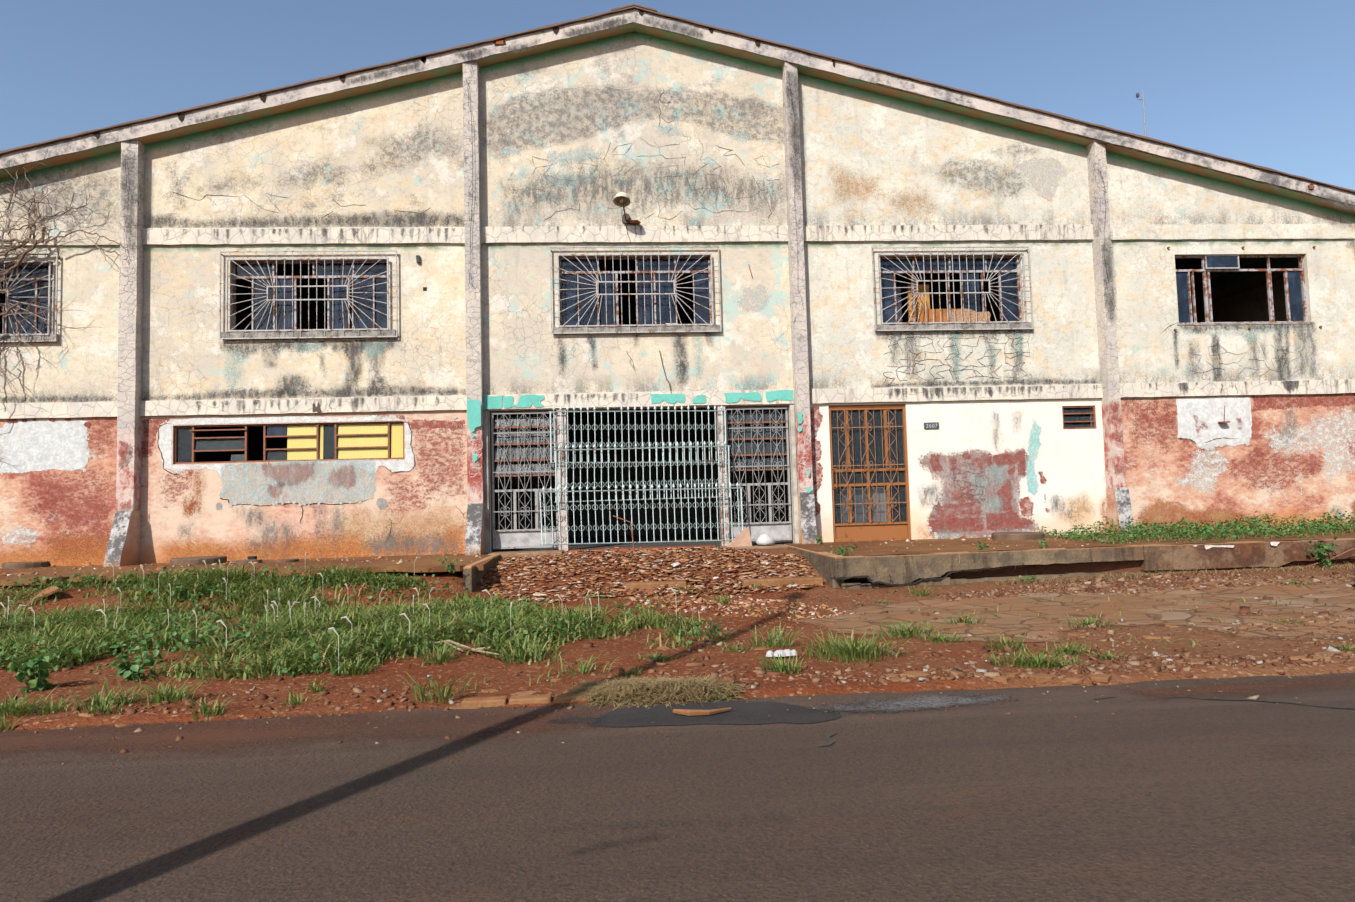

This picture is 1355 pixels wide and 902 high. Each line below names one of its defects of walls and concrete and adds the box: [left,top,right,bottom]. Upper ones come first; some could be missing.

leakage [486,71,801,183]
leakage [512,170,776,227]
leakage [943,163,1020,196]
flaking render [0,394,545,545]
peeling [651,394,706,404]
peeling [724,390,823,516]
flaking render [919,421,1048,539]
peeling [1111,397,1177,453]
leakage [1174,324,1316,393]
peeling [1178,394,1355,516]